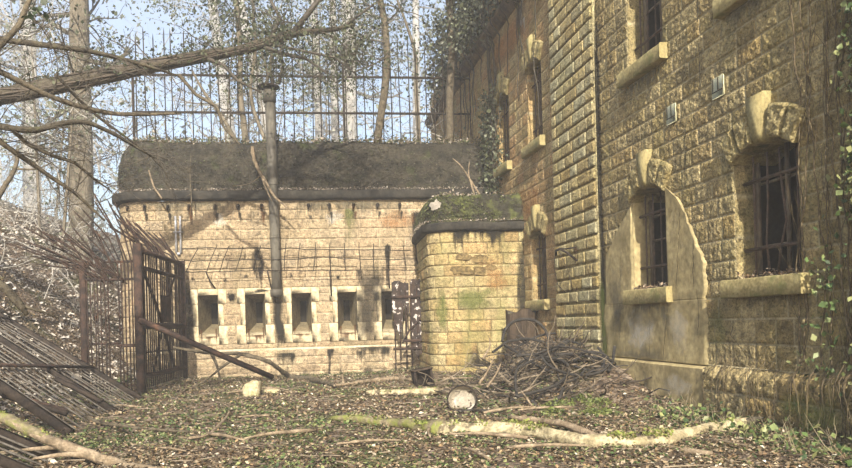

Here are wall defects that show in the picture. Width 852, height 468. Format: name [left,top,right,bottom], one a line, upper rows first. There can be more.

leakage [306,202,382,222]
leakage [460,292,483,306]